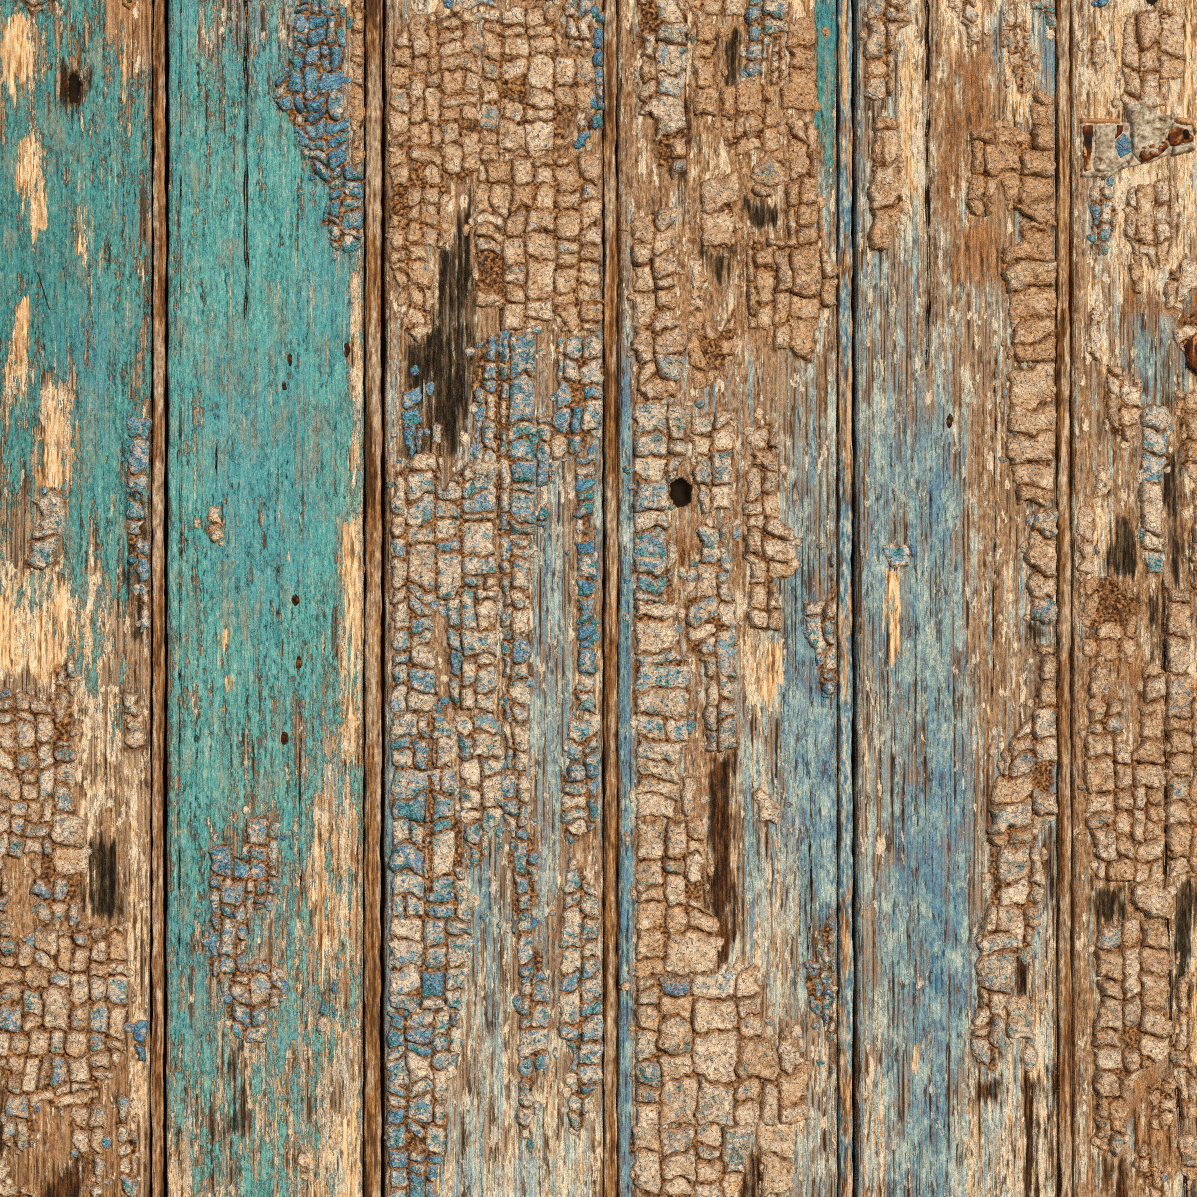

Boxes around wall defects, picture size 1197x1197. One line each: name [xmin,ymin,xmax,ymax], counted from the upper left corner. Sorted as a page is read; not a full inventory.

peeling [20,0,58,15]
peeling [272,0,365,263]
peeling [857,0,911,251]
peeling [947,0,1059,625]
rust [1082,125,1093,172]
peeling [1077,7,1186,109]
peeling [1086,133,1197,352]
peeling [618,0,838,1197]
peeling [0,485,149,1197]
peeling [195,804,289,1053]
peeling [970,644,1058,1072]
peeling [1076,306,1197,1197]